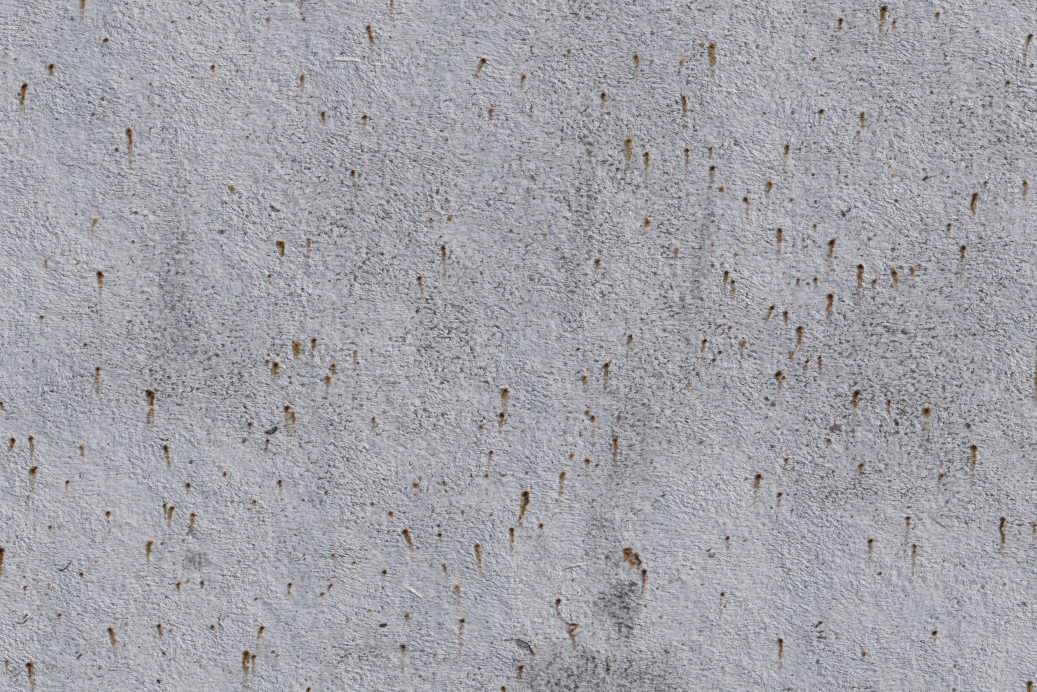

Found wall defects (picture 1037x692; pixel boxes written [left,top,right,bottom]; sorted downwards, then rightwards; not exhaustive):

rust [701,42,716,77]
rust [763,301,822,380]
rust [146,389,155,424]
rust [499,388,509,433]
rust [510,491,529,551]
rust [623,545,648,595]
rust [557,598,578,650]
rust [230,626,264,688]